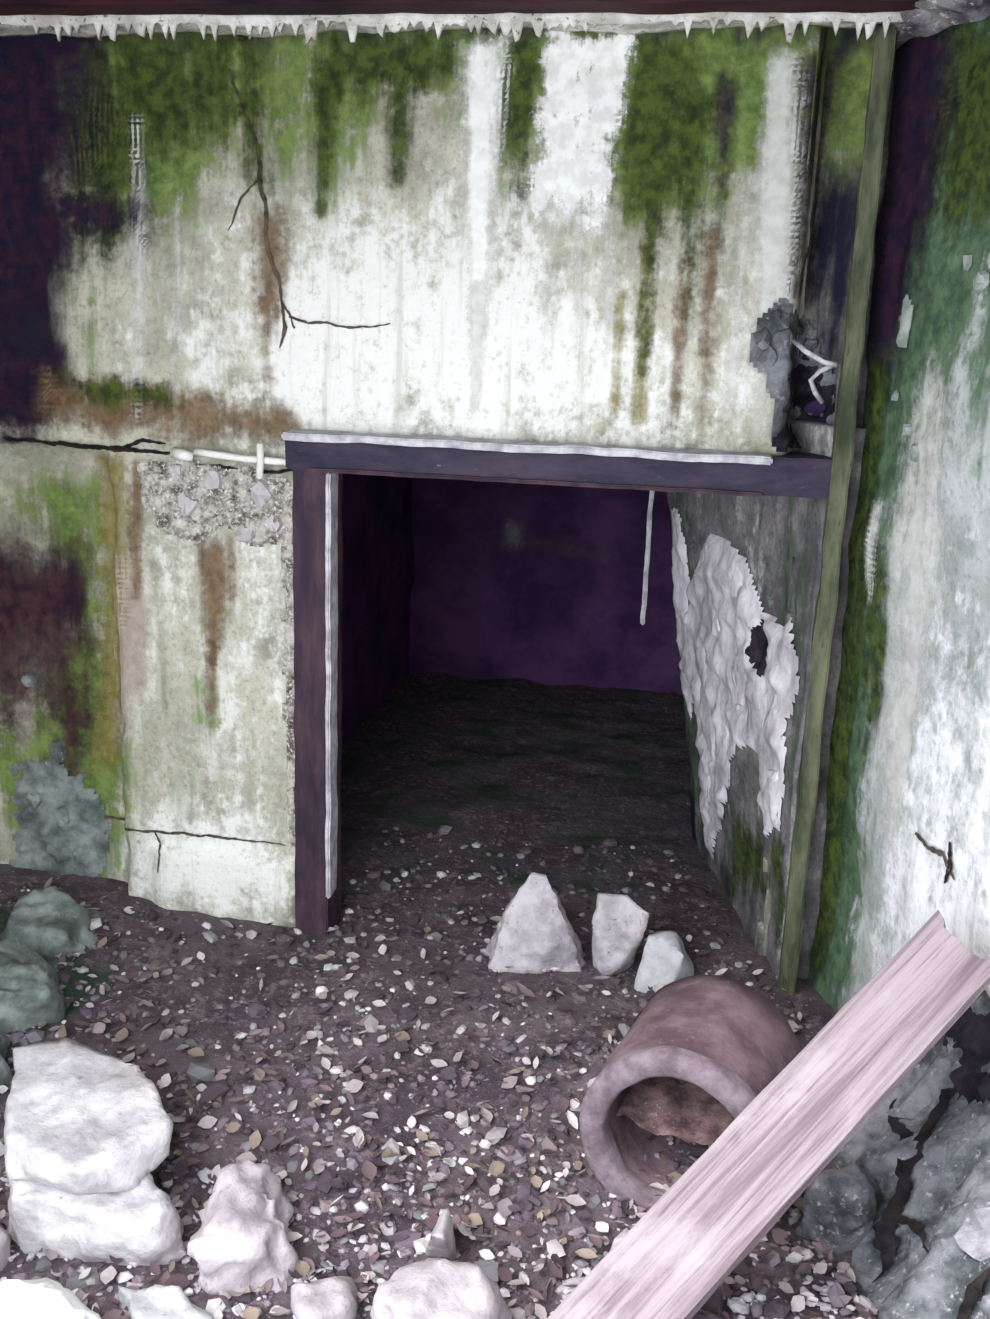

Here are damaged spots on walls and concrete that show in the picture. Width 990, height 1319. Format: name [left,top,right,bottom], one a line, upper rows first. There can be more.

leakage [0,32,263,443]
crack [228,68,390,348]
leakage [311,30,737,409]
leakage [736,51,834,318]
crack [3,437,170,455]
crack [200,464,293,474]
leakage [810,22,990,973]
leakage [0,538,91,776]
spalling [137,459,295,847]
peeling [671,507,800,860]
crack [872,1087,955,1283]
crack [956,1267,990,1319]